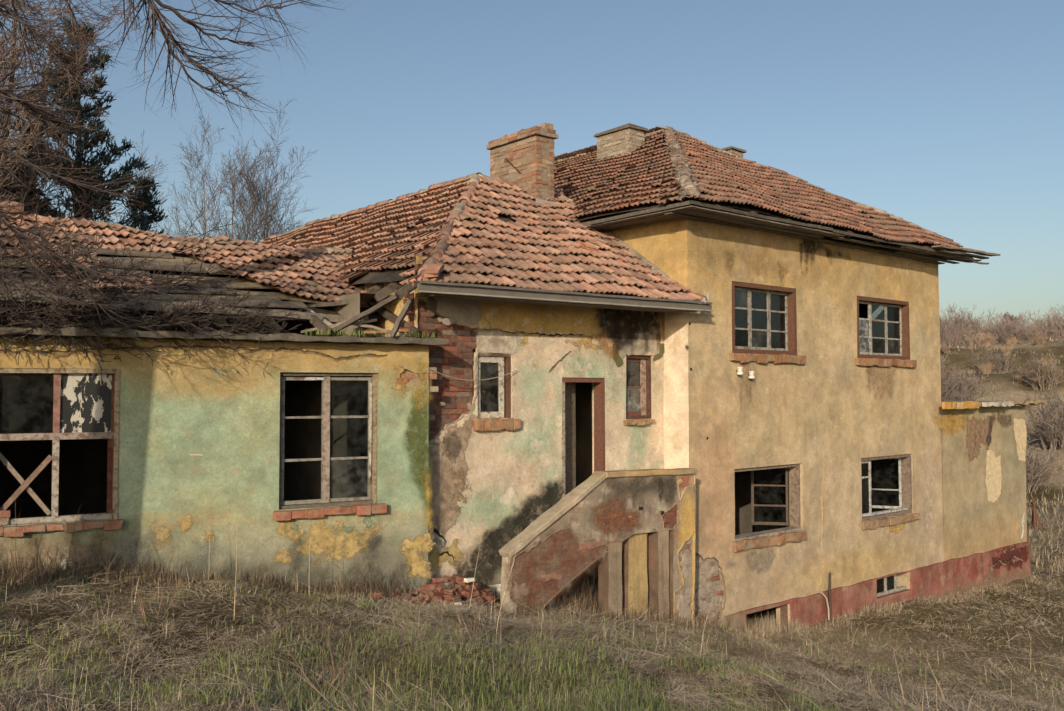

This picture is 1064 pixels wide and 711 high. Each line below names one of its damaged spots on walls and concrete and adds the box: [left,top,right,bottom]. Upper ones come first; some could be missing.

water stain [595,304,660,349]
flaking render [394,292,529,578]
peeling [966,401,1027,503]
spalling [0,510,10,525]
peeling [272,516,382,568]
flaking render [506,528,630,613]
spalling [673,530,734,624]
spalling [989,513,1028,571]